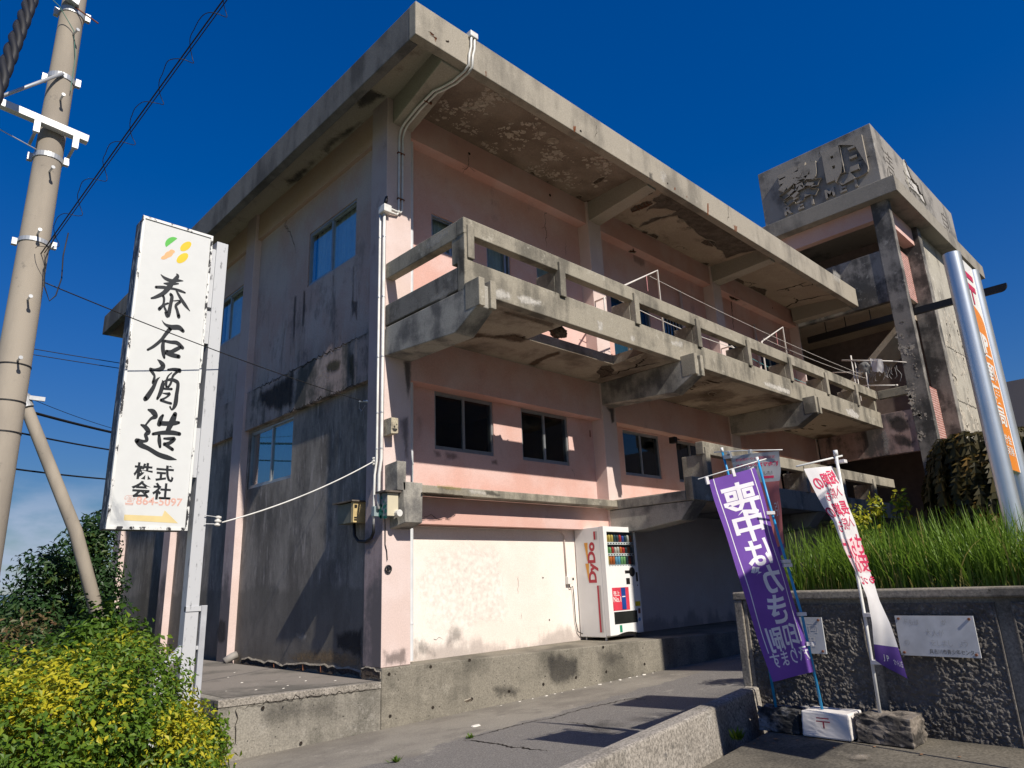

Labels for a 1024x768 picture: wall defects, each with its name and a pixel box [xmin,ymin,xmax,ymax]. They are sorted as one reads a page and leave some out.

peeling [431,87,612,202]
peeling [628,182,756,258]
peeling [903,159,927,206]
water stain [260,372,293,409]
peeling [895,321,927,441]
spalling [241,657,381,680]